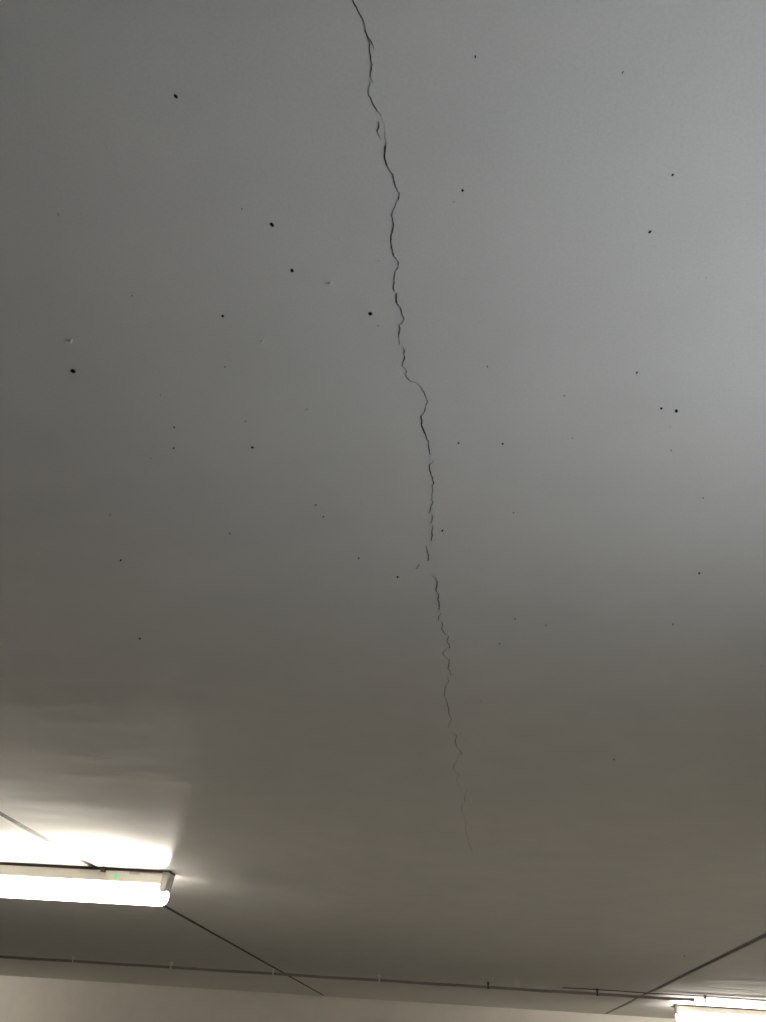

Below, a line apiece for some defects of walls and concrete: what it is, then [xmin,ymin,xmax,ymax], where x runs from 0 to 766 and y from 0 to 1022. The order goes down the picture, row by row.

crack [352,0,462,754]